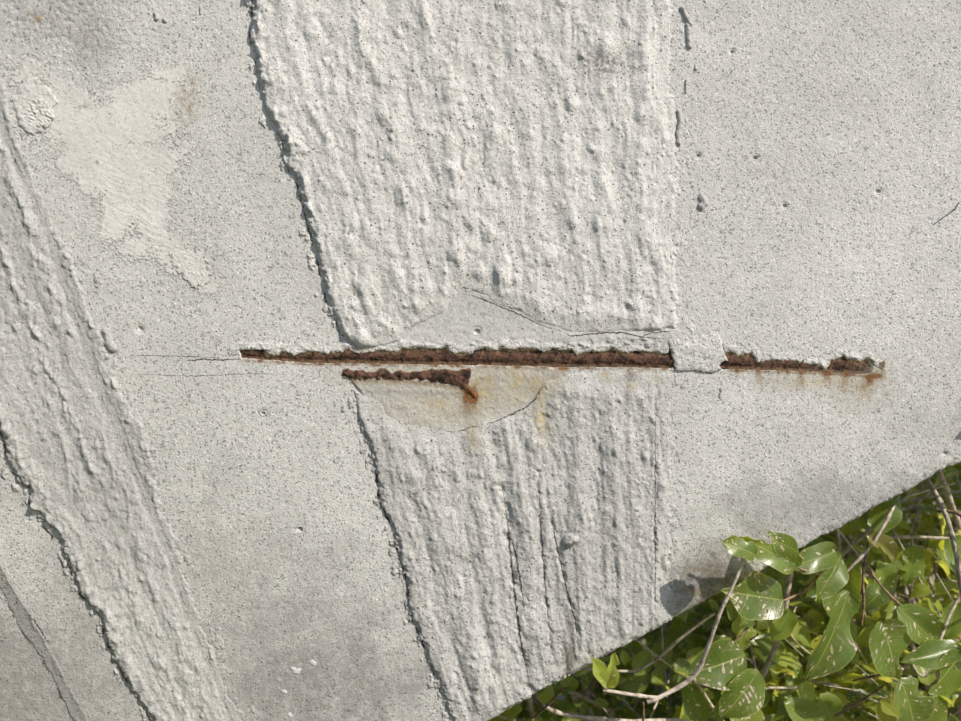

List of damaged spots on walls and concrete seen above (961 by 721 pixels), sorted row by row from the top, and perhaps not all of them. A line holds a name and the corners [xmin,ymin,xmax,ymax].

spalling [227,288,882,373]
crack [461,293,673,339]
spalling [351,365,567,433]
crack [461,388,541,431]
rust [453,365,592,430]
rust [729,361,885,387]
crack [503,482,579,694]